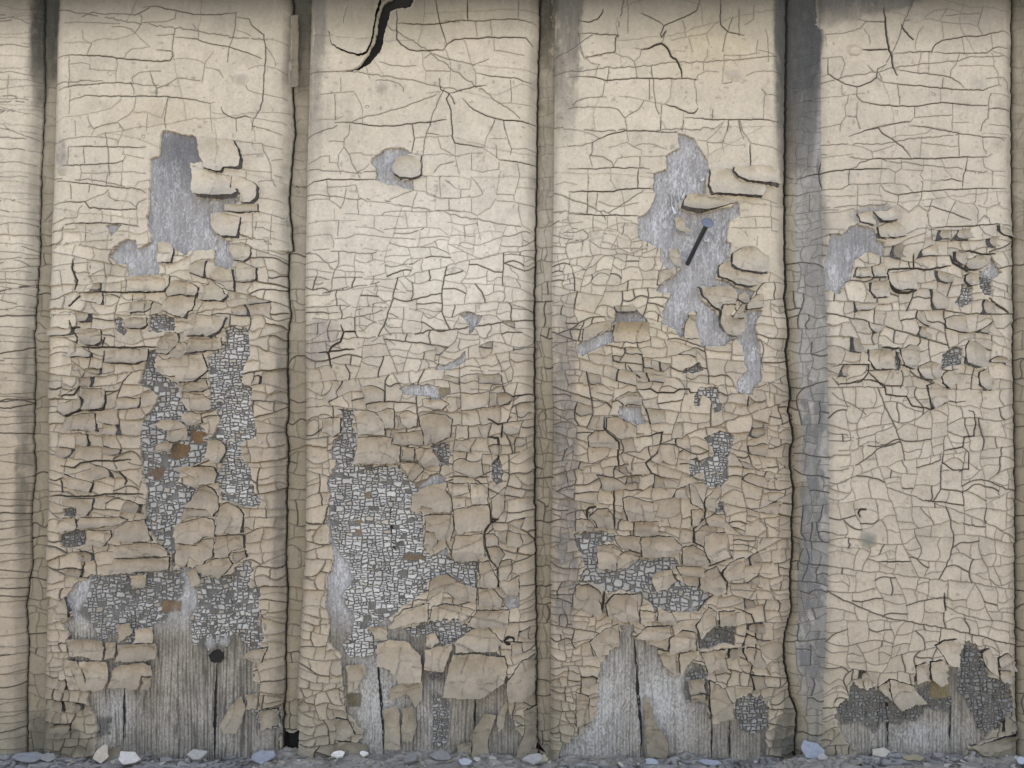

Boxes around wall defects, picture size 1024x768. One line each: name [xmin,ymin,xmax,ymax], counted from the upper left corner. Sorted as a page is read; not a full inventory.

crack [26,0,266,748]
peeling [46,131,284,763]
crack [282,87,296,662]
crack [320,329,354,365]
peeling [322,345,538,761]
crack [348,0,541,540]
crack [484,505,499,586]
peeling [558,427,769,760]
peeling [613,134,782,406]
crack [569,0,1019,748]
peeling [823,205,1017,408]
peeling [834,638,1020,756]